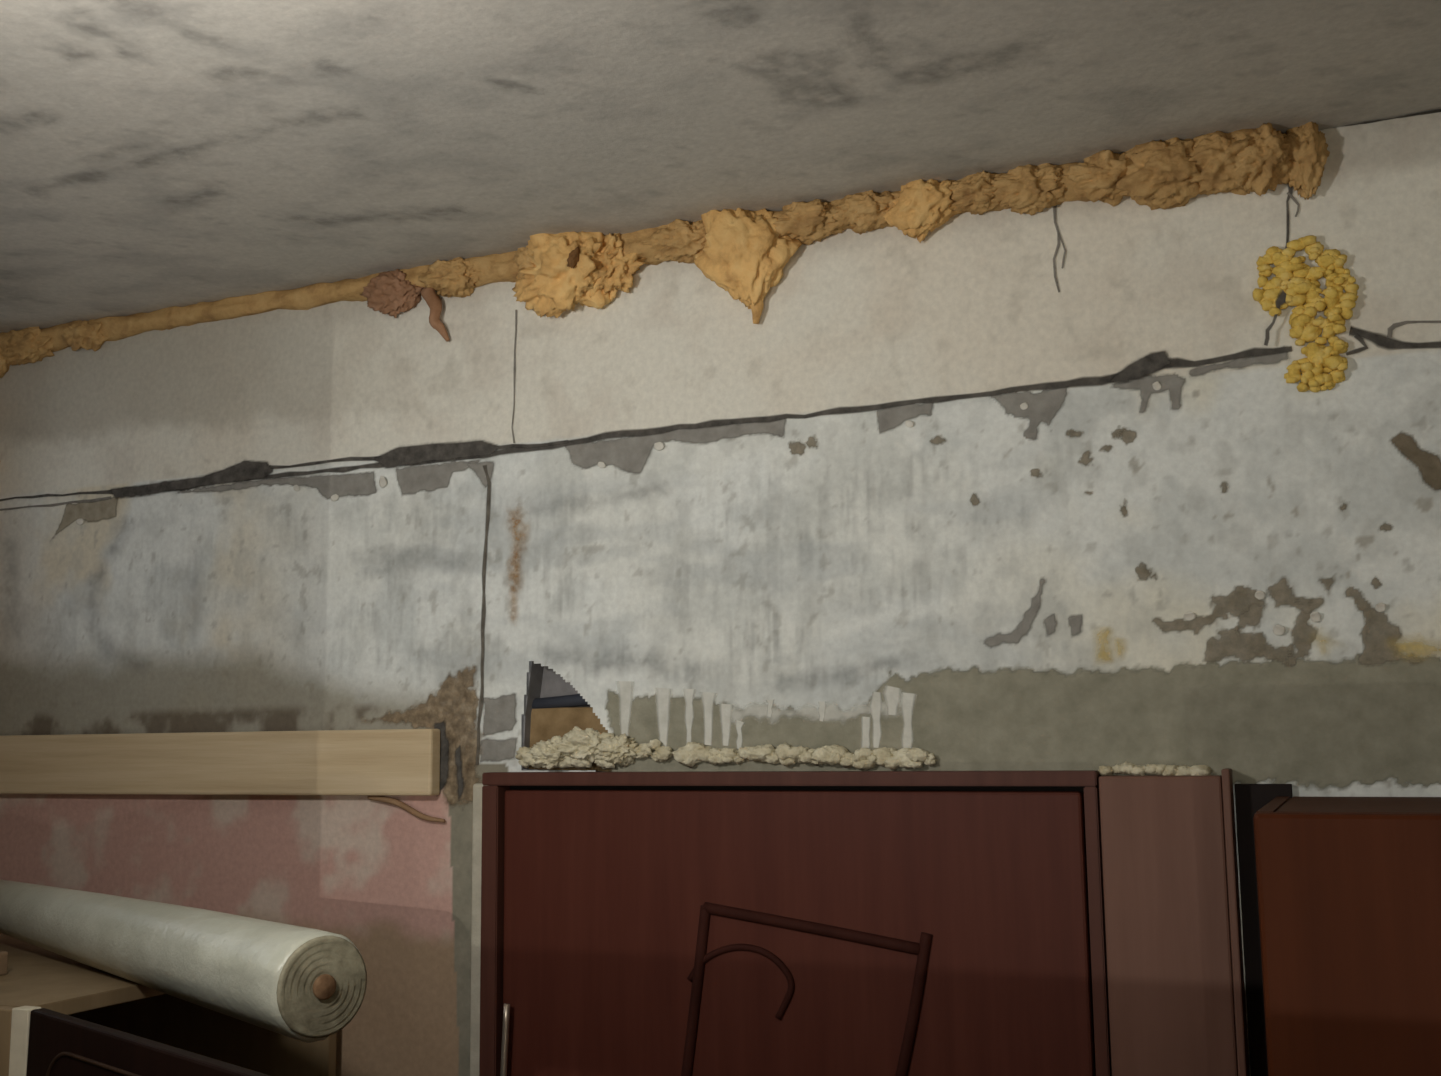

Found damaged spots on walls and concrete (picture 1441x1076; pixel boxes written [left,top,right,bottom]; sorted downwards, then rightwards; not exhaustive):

crack [1285,184,1300,249]
crack [1346,321,1441,355]
peeling [1113,352,1288,413]
peeling [877,403,933,433]
peeling [991,387,1067,440]
peeling [565,419,818,474]
peeling [1066,428,1136,466]
spalling [1391,433,1441,490]
crack [0,290,1292,765]
peeling [1135,563,1156,580]
spalling [364,578,1441,805]